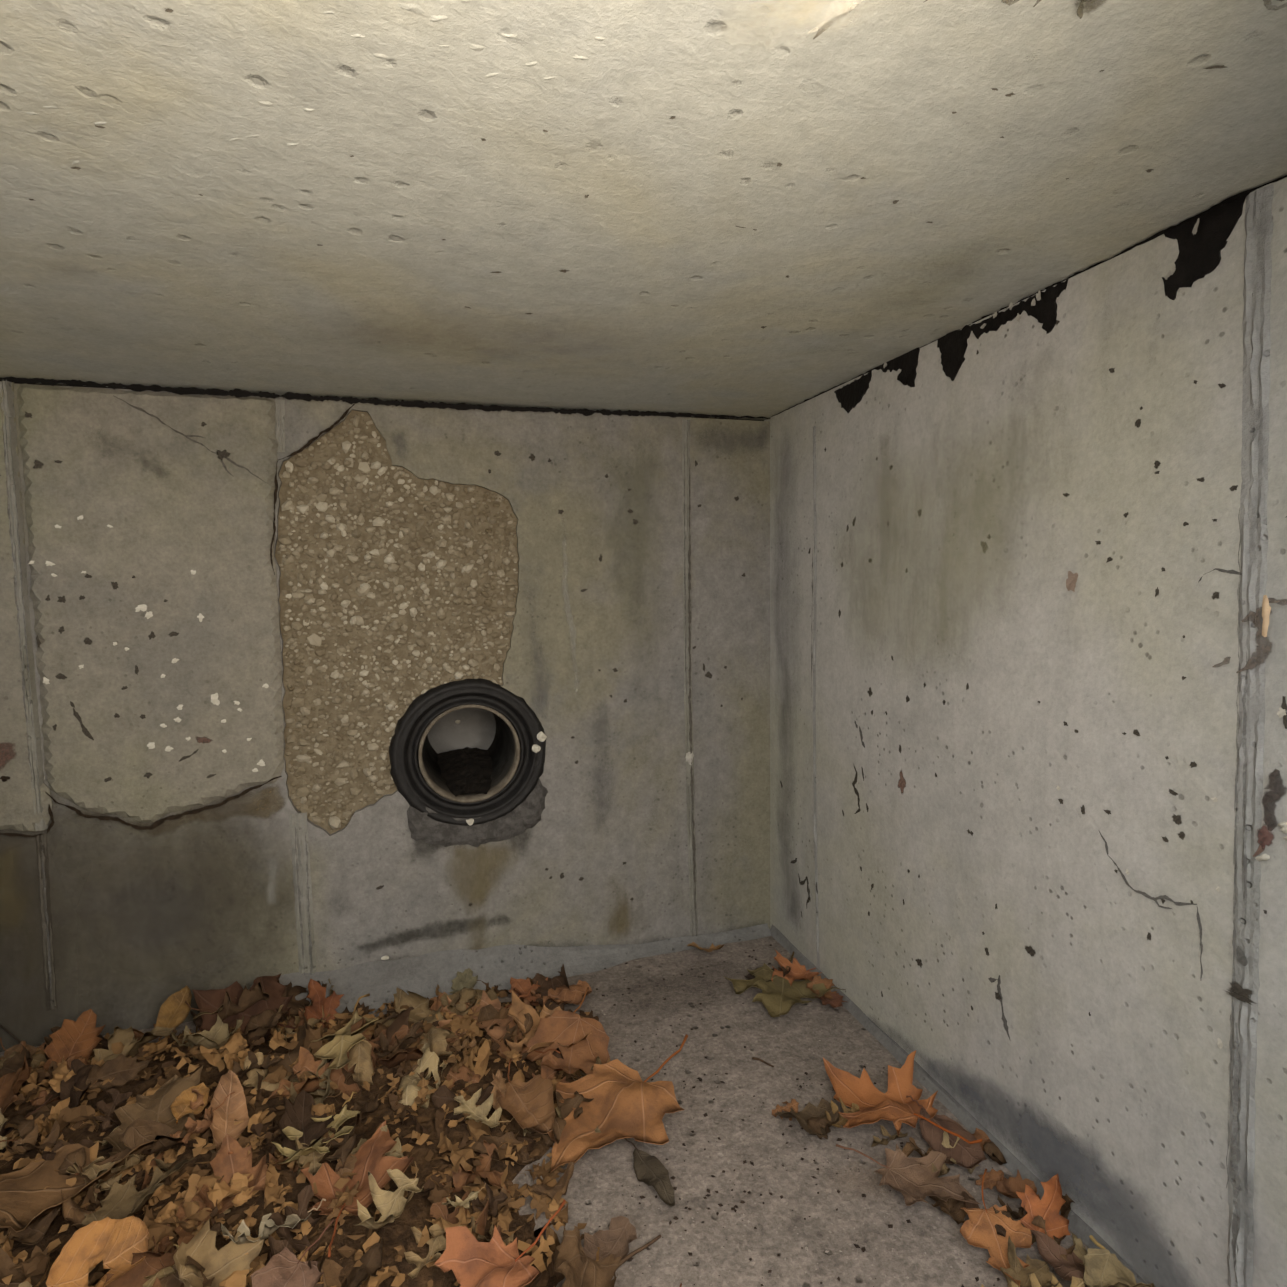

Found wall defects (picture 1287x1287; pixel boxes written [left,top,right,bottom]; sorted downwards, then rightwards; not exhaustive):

crack [0,175,1287,575]
peeling [980,290,1041,329]
flaking render [0,382,519,834]
crack [1199,568,1242,581]
water stain [362,920,481,948]
crack [1099,831,1203,979]